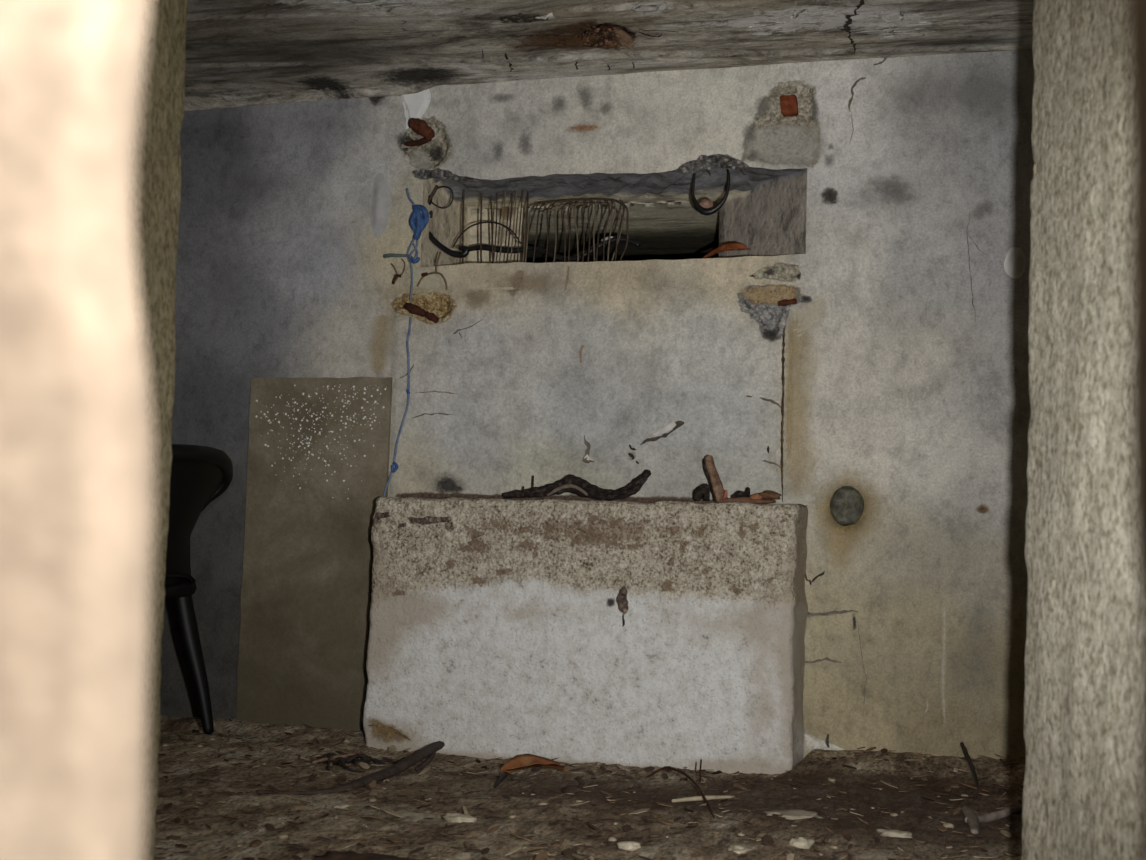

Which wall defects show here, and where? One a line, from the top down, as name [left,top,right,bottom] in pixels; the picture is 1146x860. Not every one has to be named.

crack [841,0,887,144]
spalling [398,116,479,182]
spalling [674,81,822,176]
spalling [391,292,456,324]
spalling [738,263,811,341]